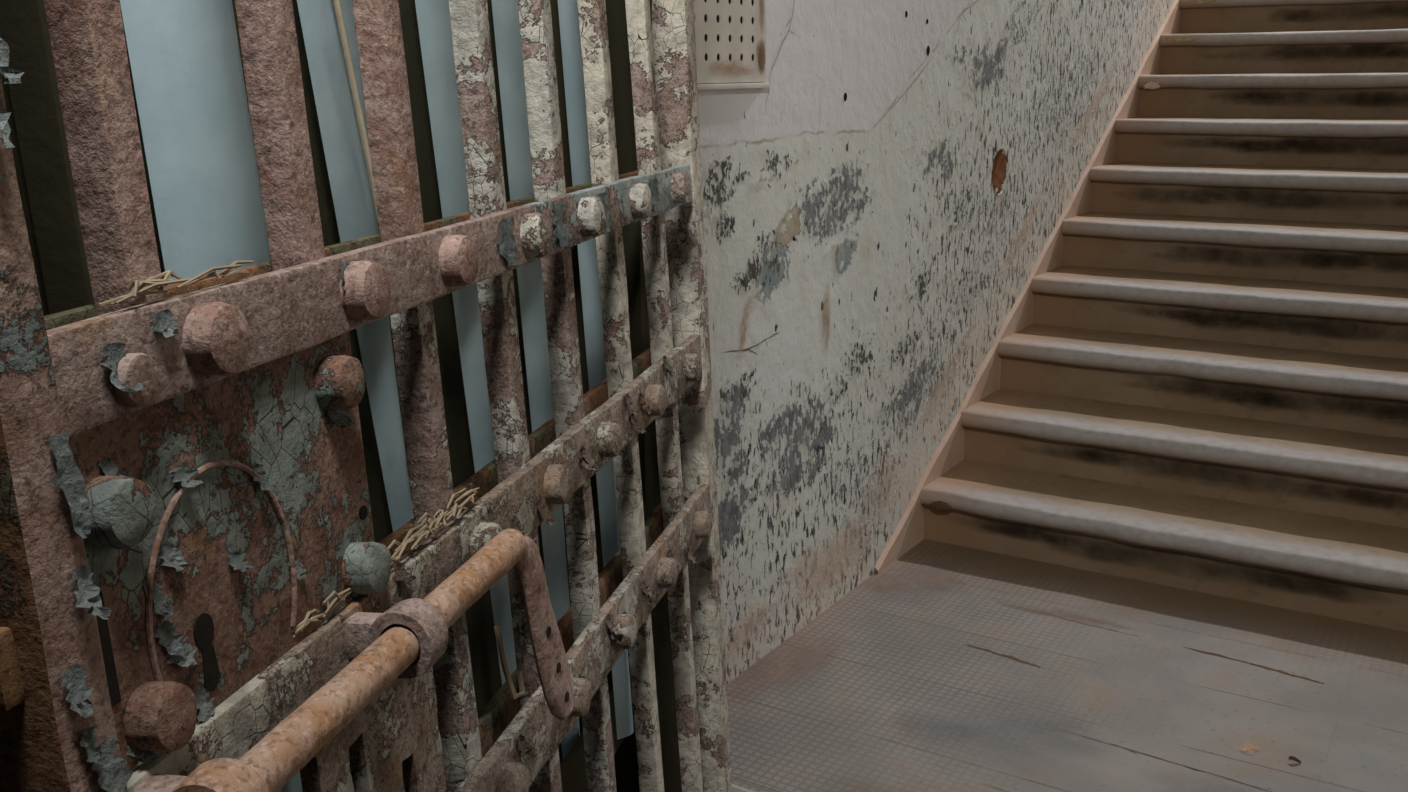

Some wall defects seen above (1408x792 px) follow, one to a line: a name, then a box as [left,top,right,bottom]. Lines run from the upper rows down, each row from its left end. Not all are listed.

peeling [703,147,881,305]
peeling [712,328,959,555]